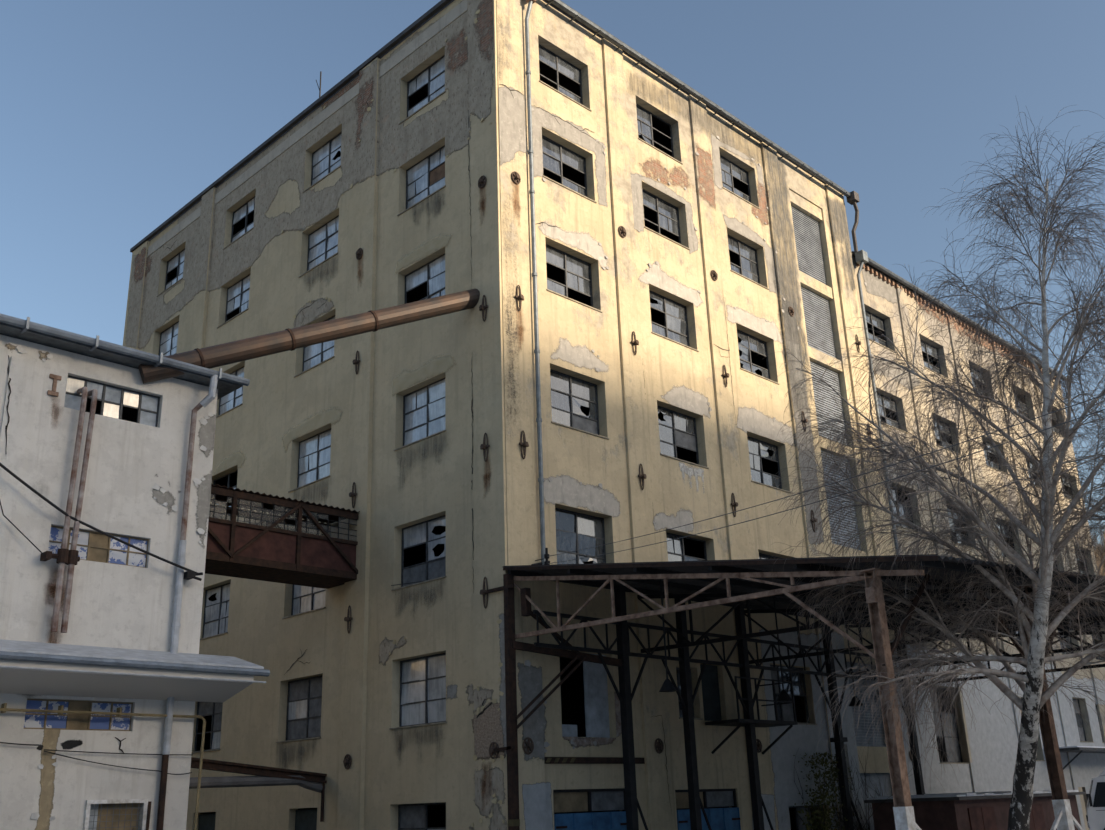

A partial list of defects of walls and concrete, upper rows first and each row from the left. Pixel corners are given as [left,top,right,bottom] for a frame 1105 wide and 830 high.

flaking render [125,0,494,349]
flaking render [631,146,716,207]
crack [4,355,12,447]
flaking render [198,412,217,457]
flaking render [152,474,180,514]
flaking render [193,472,212,548]
flaking render [466,614,550,830]
flaking render [31,729,83,830]